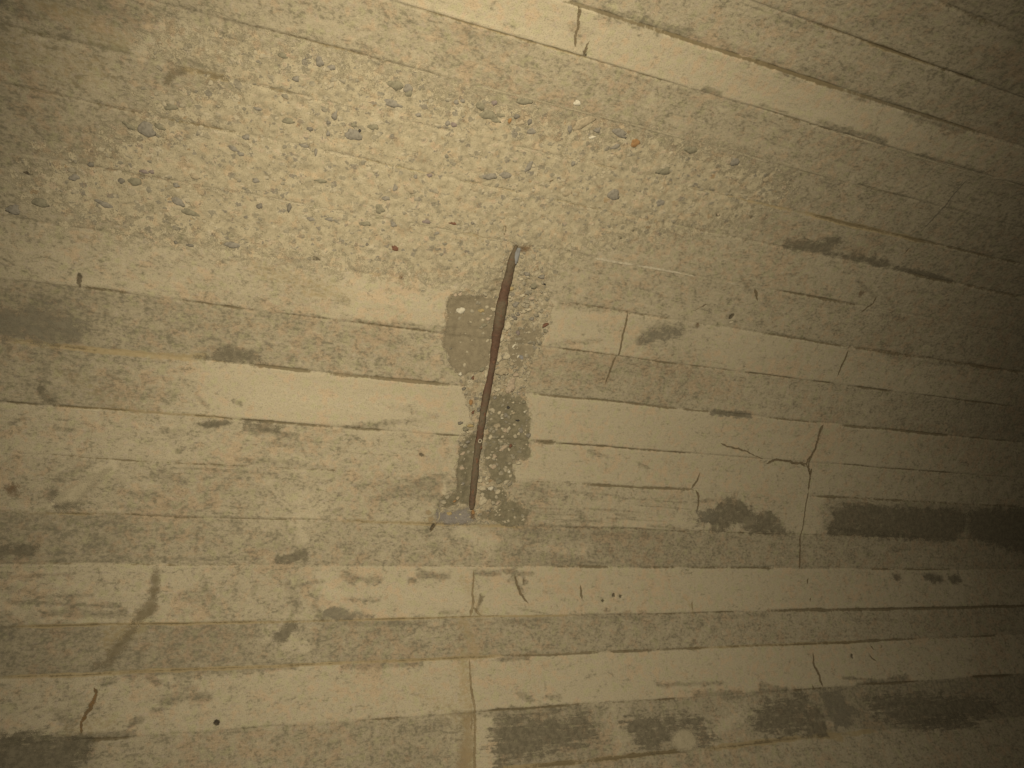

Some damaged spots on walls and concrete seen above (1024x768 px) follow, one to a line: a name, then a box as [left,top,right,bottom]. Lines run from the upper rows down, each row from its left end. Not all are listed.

crack [574,6,589,55]
crack [602,312,628,384]
spalling [434,243,554,527]
leakage [696,499,791,536]
crack [721,426,823,601]
leakage [827,503,1024,553]
crack [812,654,823,689]
leakage [460,710,598,768]
leakage [619,711,718,754]
leakage [748,688,856,739]